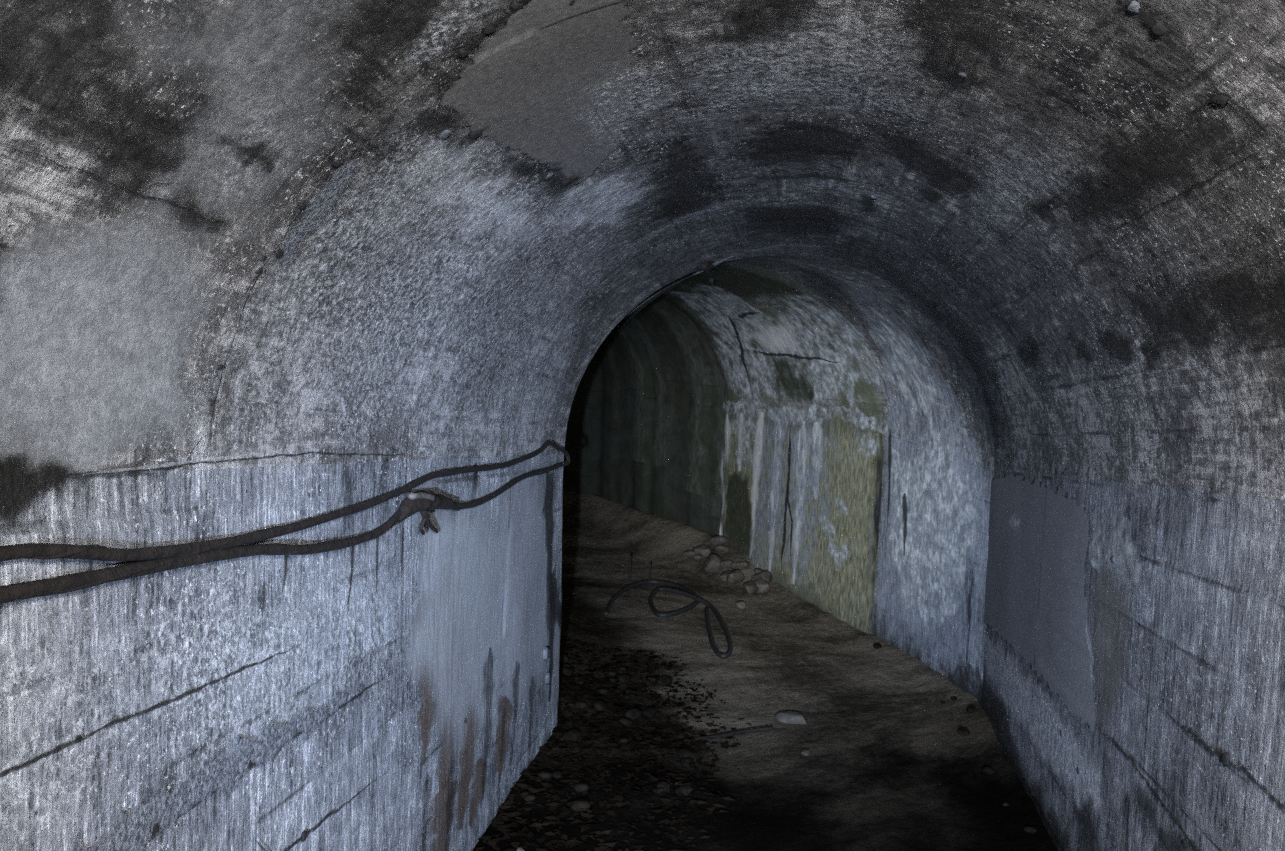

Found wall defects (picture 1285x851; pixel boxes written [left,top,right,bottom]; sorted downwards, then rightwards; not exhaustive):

leakage [0,0,319,522]
leakage [245,133,1101,851]
leakage [1089,517,1141,583]
crack [0,644,301,777]
rust [420,661,512,851]
crack [1094,724,1196,851]
leakage [1125,791,1183,851]
crack [1156,702,1285,810]